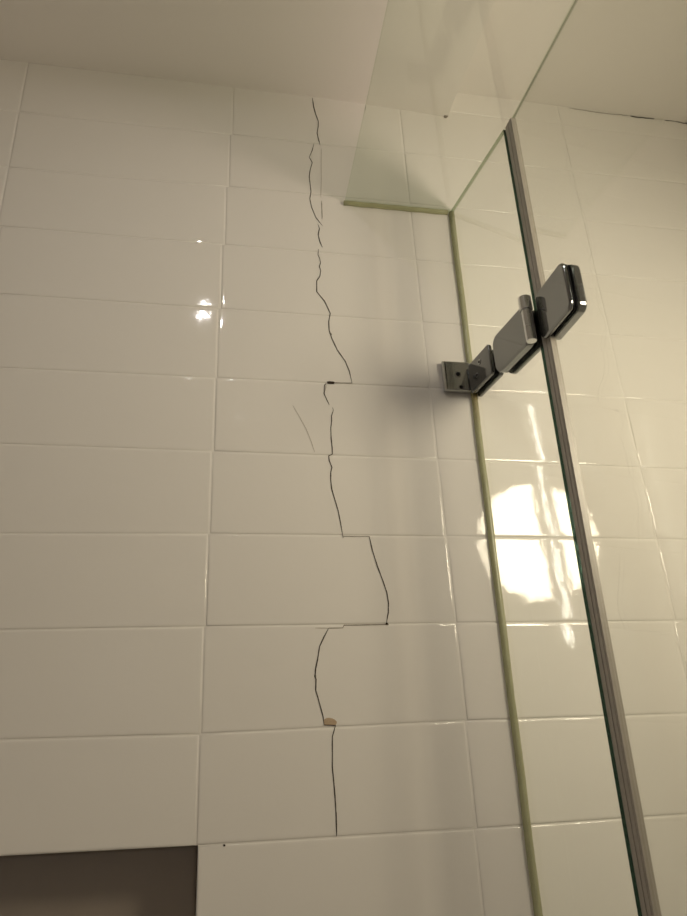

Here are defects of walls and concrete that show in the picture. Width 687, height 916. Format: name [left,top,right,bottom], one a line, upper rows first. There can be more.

crack [293,98,389,836]